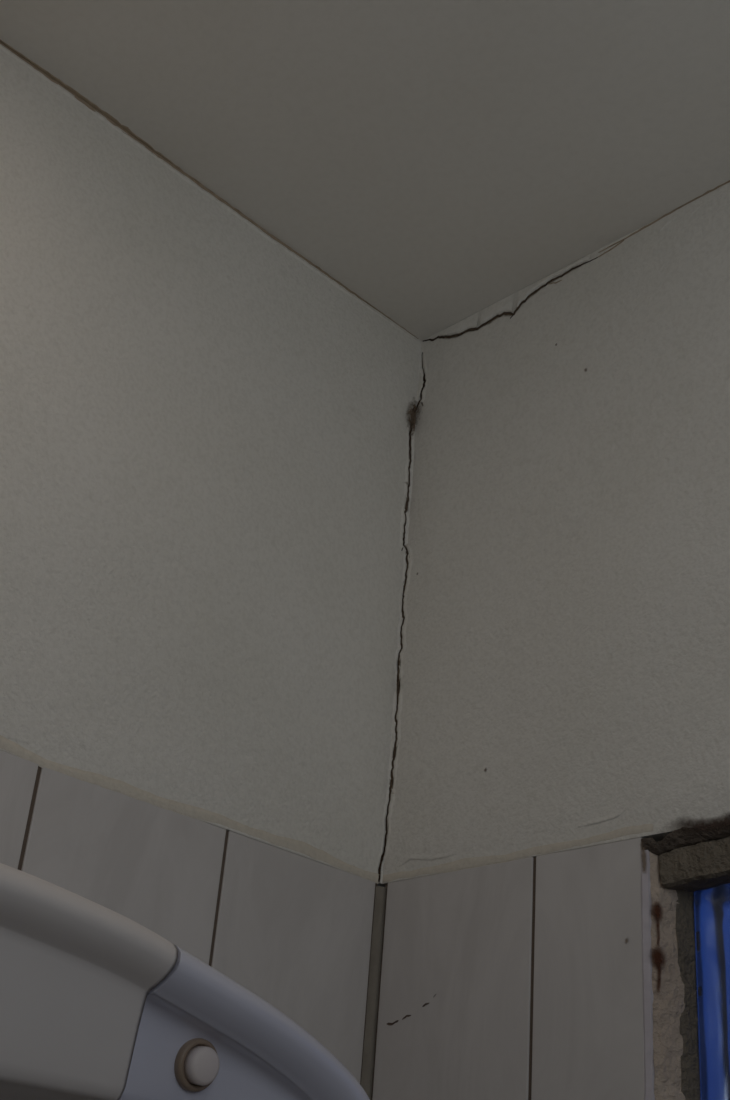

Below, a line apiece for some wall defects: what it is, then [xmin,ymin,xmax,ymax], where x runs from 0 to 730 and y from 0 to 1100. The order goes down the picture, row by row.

crack [0,39,730,884]